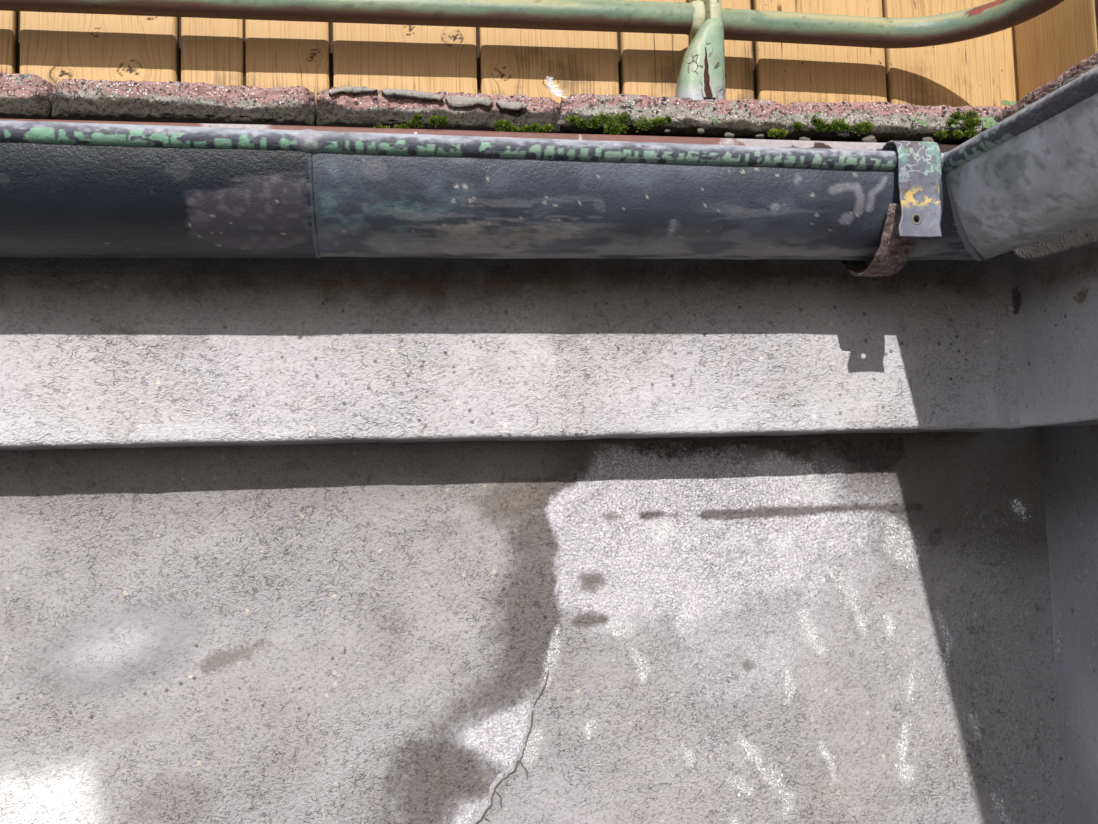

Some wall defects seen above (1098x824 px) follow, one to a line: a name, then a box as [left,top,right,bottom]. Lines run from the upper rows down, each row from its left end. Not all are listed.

crack [471,671,549,824]
leakage [388,438,941,824]